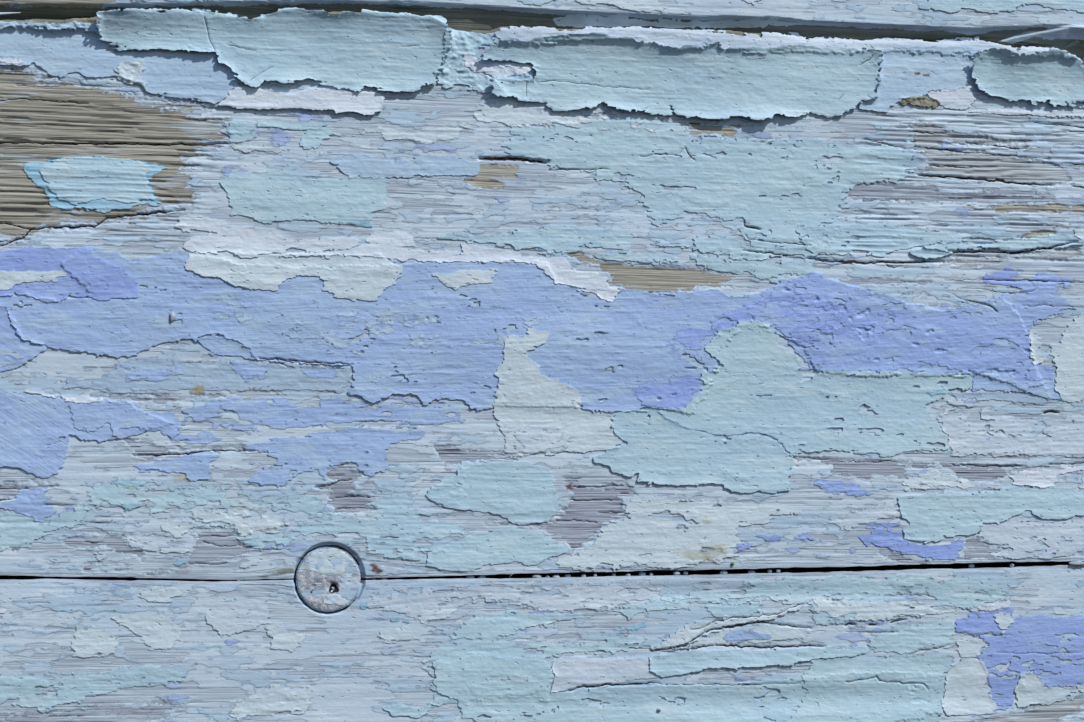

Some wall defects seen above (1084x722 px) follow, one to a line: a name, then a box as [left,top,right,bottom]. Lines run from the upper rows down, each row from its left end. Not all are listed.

crack [0,85,86,104]
crack [1,140,224,148]
crack [0,210,180,246]
peeling [0,0,1084,572]
peeling [205,597,307,652]
peeling [360,573,1084,722]
peeling [227,684,314,720]